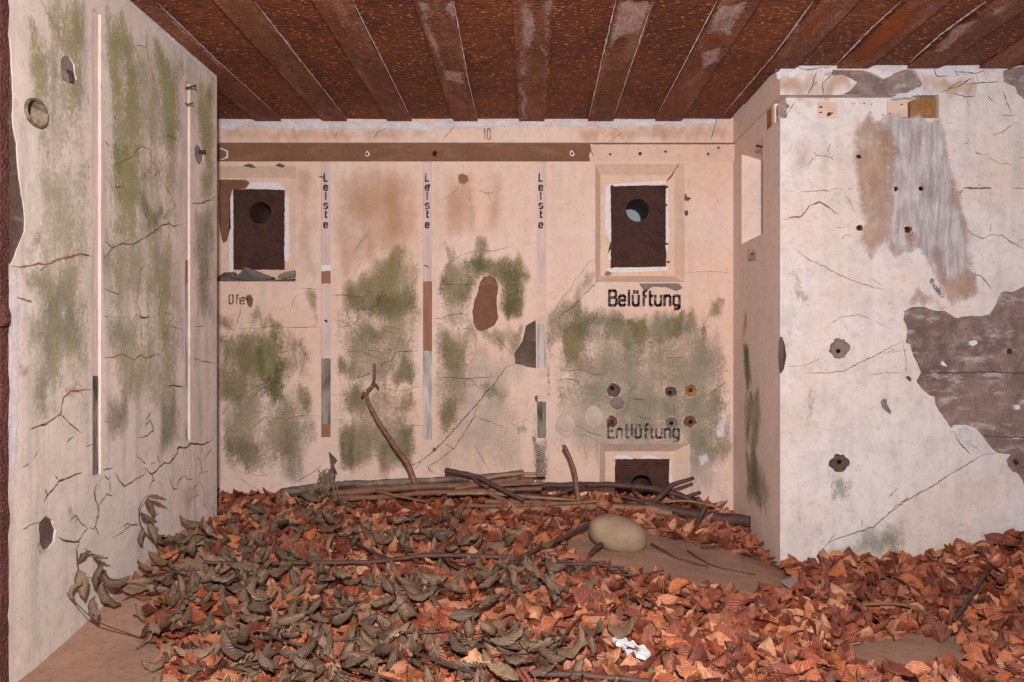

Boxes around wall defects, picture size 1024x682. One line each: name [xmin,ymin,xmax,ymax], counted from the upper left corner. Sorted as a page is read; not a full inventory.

spalling [776,65,1024,99]
leakage [857,114,977,301]
crack [16,135,527,491]
spalling [472,275,498,331]
spalling [514,320,536,368]
leakage [563,312,601,360]
leakage [269,360,286,402]
spalling [903,287,1024,483]
leakage [716,419,727,438]
crack [24,413,215,547]
leakage [531,437,548,483]
crack [815,431,1024,559]